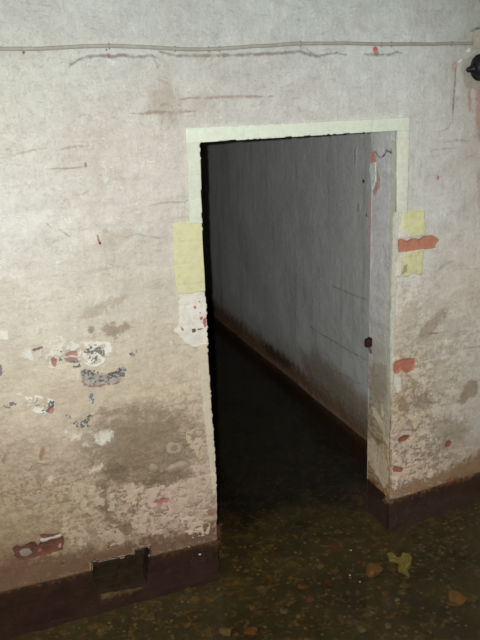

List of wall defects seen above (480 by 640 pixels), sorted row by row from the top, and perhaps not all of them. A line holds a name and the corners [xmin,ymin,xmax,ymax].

peeling [172,221,209,348]
peeling [367,141,440,491]
spalling [19,337,126,404]
water stain [206,298,368,441]
spalling [24,395,55,415]
peeling [61,414,115,452]
peeling [166,429,206,460]
peeling [7,461,217,561]
spalling [91,545,152,599]